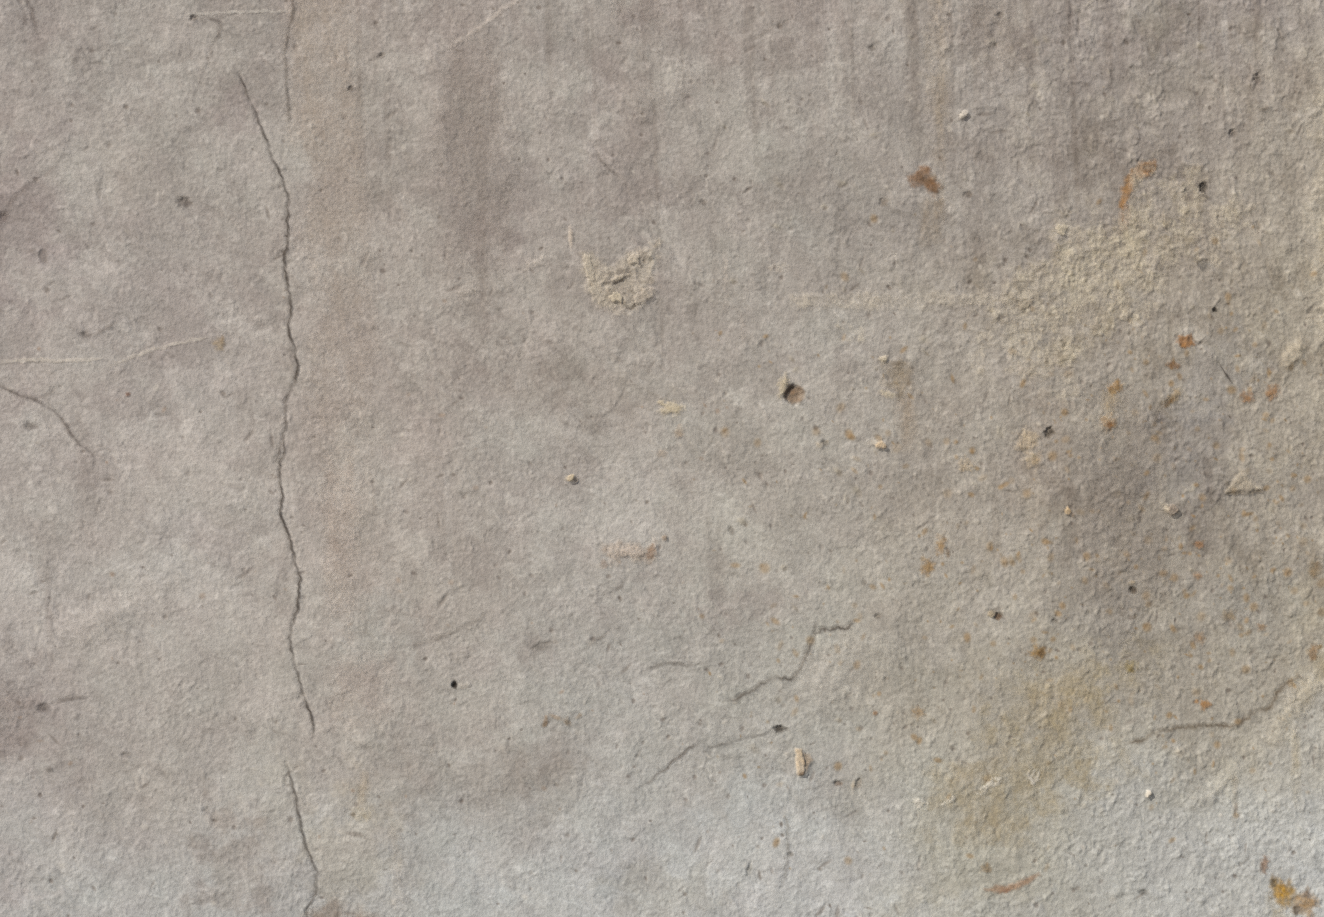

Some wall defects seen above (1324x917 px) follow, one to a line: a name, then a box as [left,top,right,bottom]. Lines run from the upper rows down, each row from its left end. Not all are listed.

crack [241,80,299,400]
corrosion [909,166,939,193]
crack [278,443,314,730]
crack [290,777,316,904]
corrosion [1261,857,1315,915]